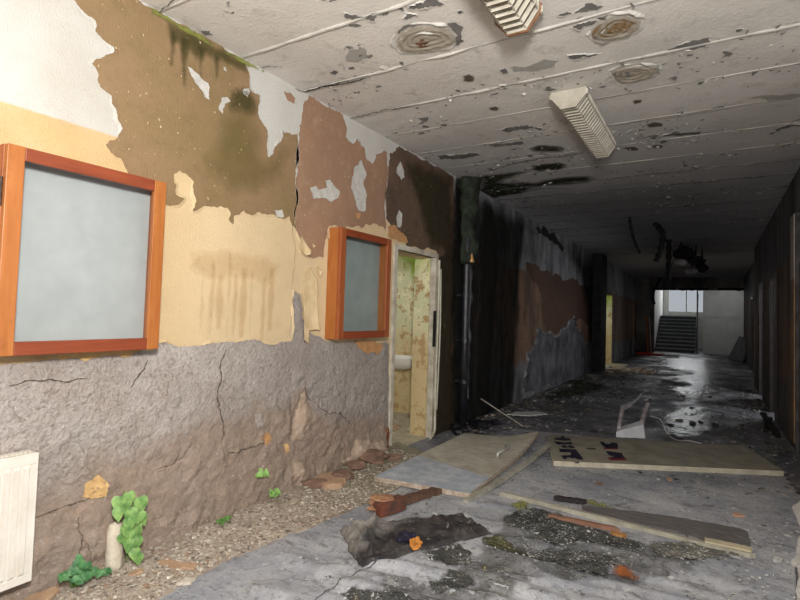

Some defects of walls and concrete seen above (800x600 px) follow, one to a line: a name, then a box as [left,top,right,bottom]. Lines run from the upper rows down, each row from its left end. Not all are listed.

peeling [712,28,757,64]
spalling [0,0,626,600]
water stain [409,163,590,436]
crack [11,378,87,386]
crack [217,349,349,459]
peeling [469,261,778,494]
crack [35,495,101,561]
peeling [480,491,800,600]